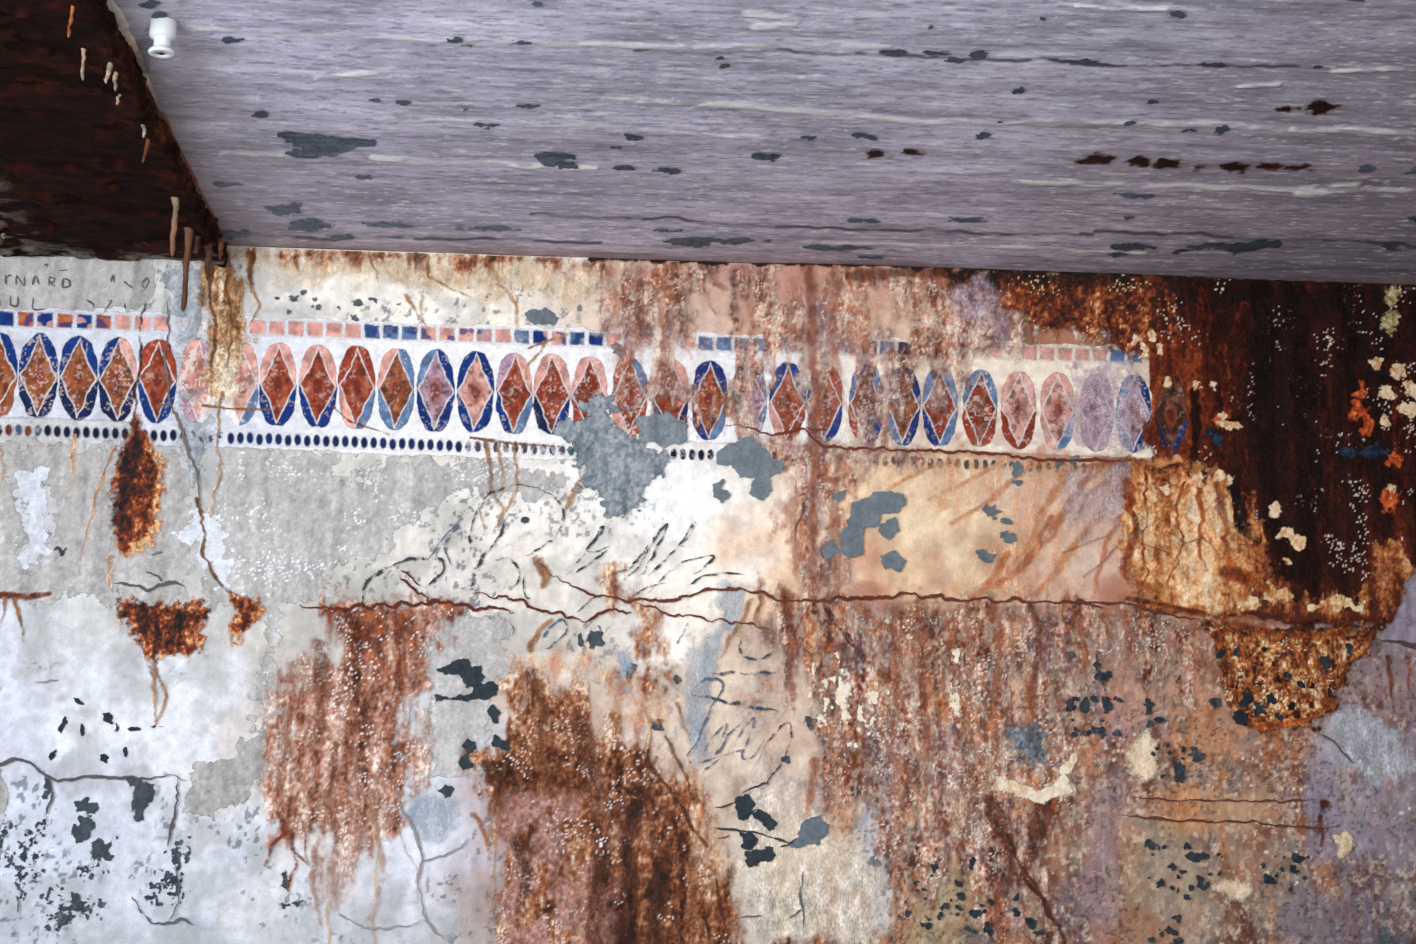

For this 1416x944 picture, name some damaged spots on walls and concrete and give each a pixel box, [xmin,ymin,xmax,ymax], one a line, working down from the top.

rust [0,591,51,635]
rust [69,434,77,487]
rust [83,304,211,723]
peeling [0,255,688,822]
peeling [712,436,784,503]
crack [300,565,1228,630]
rust [194,247,1416,944]
spalling [1200,618,1386,734]
peeling [0,768,118,944]
crack [0,757,195,925]
crack [714,782,805,944]
crack [1119,796,1337,829]